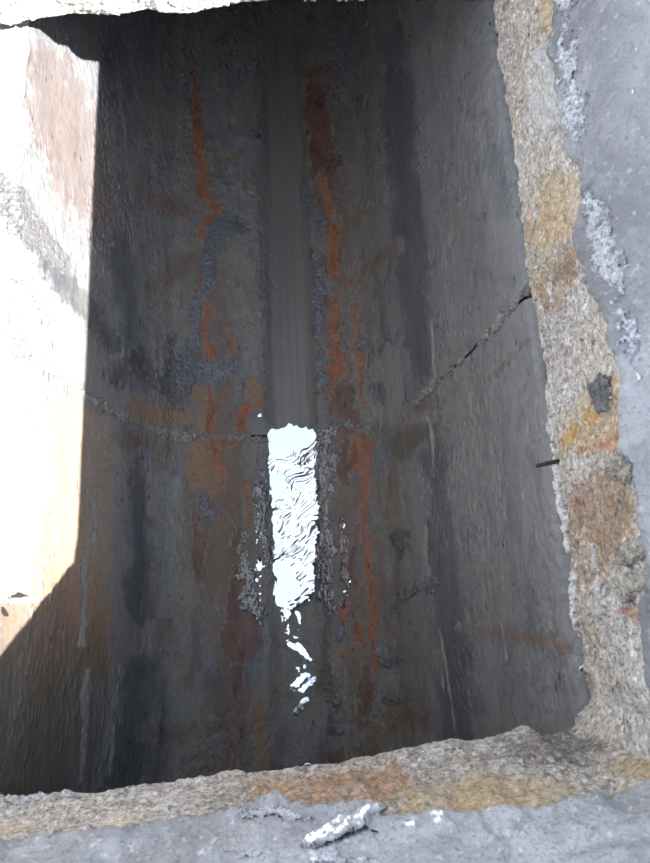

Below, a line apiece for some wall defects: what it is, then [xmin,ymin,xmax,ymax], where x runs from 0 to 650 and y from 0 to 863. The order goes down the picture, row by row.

spalling [149,210,252,412]
corrosion [0,345,140,796]
spalling [228,461,277,628]
spalling [312,422,344,623]
corrosion [173,41,650,816]